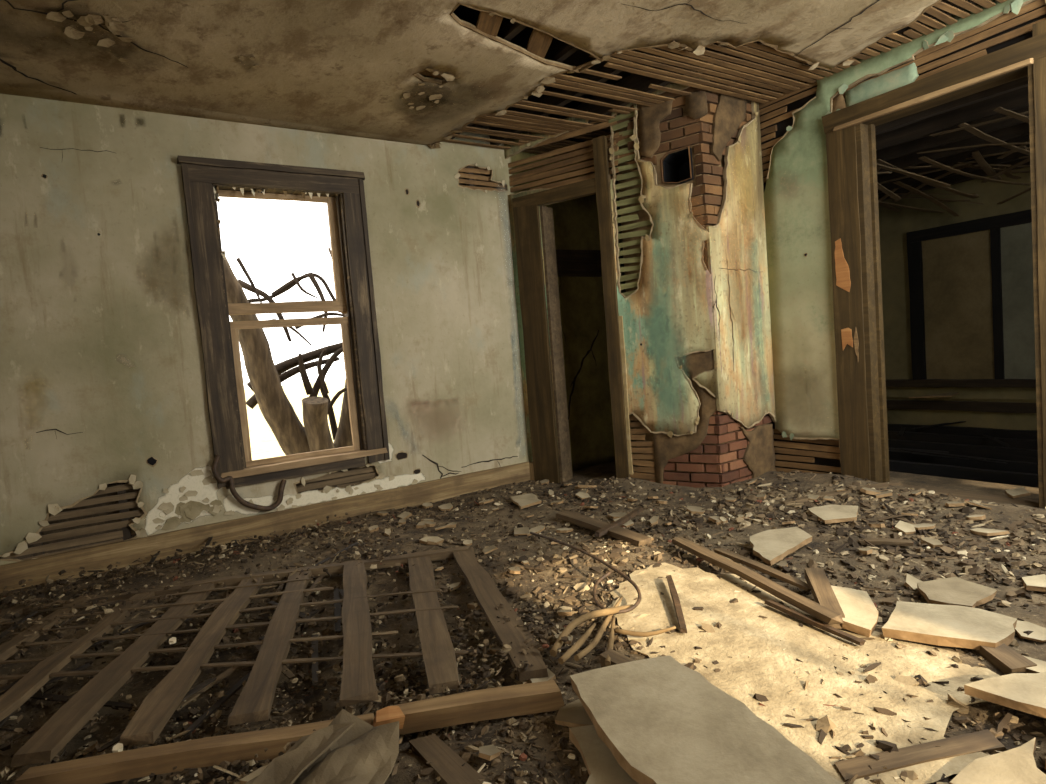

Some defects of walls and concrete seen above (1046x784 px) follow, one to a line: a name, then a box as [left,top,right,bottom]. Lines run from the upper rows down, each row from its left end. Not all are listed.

peeling [402,68,455,110]
flaking render [825,0,1046,115]
flaking render [427,0,941,298]
flaking render [627,350,841,488]
flaking render [0,443,425,562]